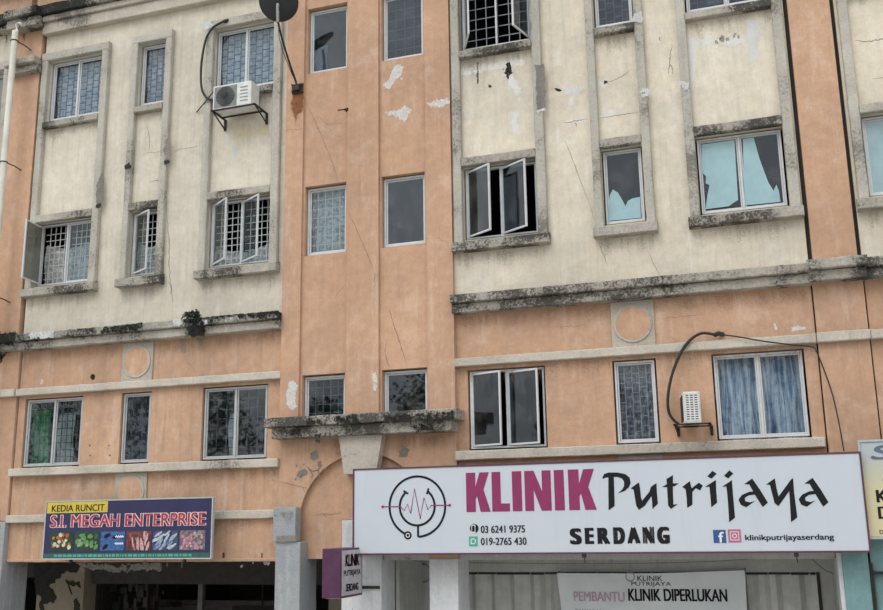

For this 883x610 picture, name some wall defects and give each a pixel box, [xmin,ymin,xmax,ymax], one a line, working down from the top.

peeling [383,64,405,89]
peeling [386,105,412,122]
peeling [426,98,450,108]
leakage [100,286,161,335]
leakage [0,331,16,363]
leakage [158,310,279,354]
peeling [286,381,298,410]
leakage [280,414,360,458]
leakage [383,411,457,453]
peeling [33,560,168,610]